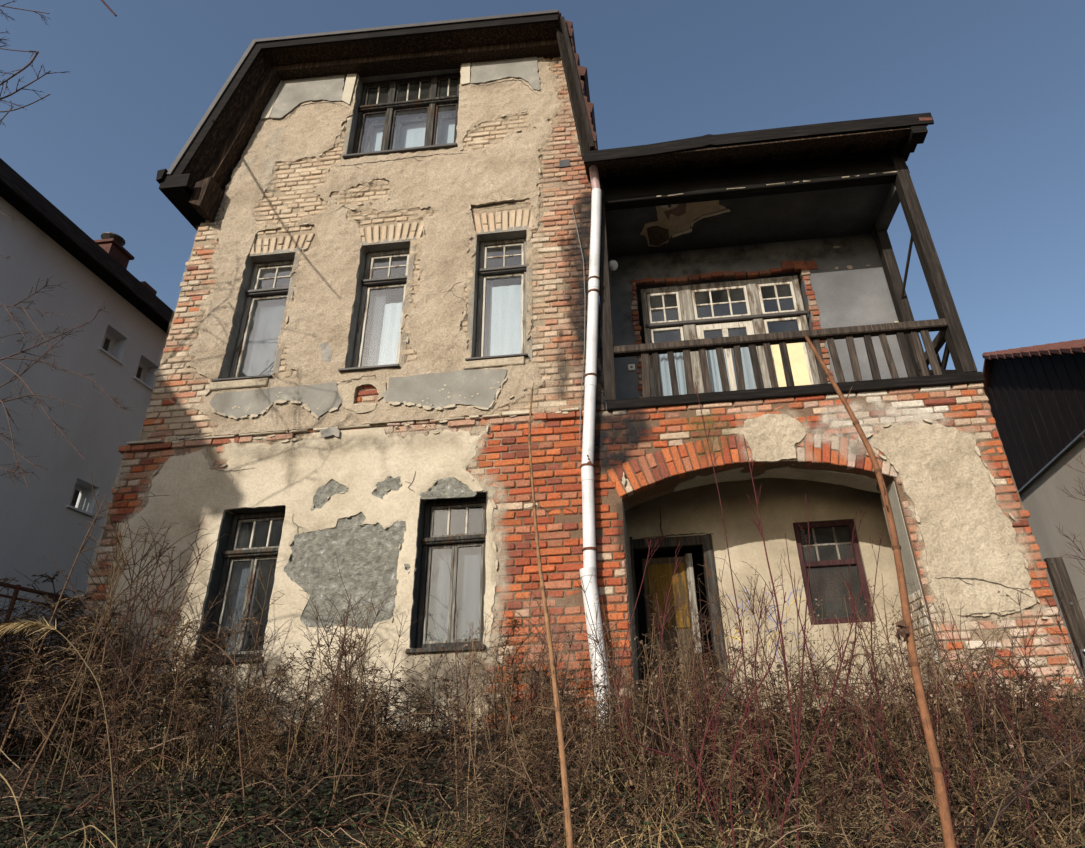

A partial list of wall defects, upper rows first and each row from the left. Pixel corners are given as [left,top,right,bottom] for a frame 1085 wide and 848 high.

spalling [250,117,434,379]
spalling [73,199,338,650]
peeling [310,479,349,511]
peeling [284,512,417,632]
spalling [353,57,1085,731]